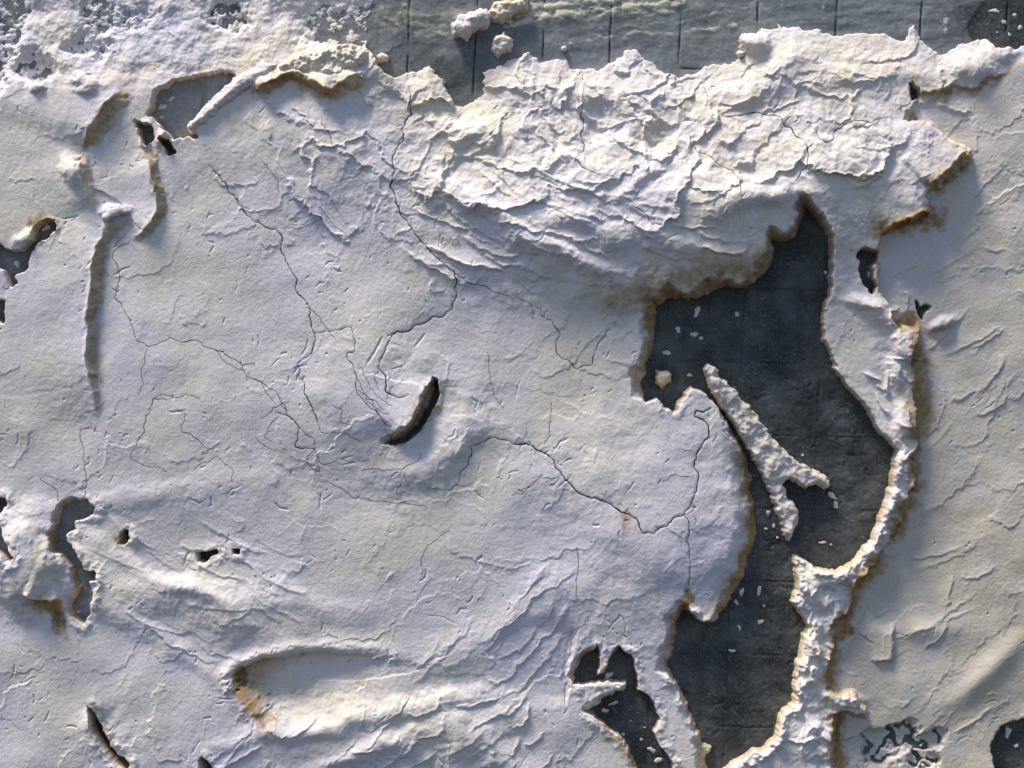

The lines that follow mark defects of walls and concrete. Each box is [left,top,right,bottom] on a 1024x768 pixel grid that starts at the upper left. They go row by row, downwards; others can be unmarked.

flaking render [0,0,52,80]
flaking render [300,0,410,58]
flaking render [967,0,1024,50]
flaking render [128,73,236,245]
crack [689,134,742,198]
flaking render [0,222,57,286]
crack [112,93,710,585]
flaking render [640,208,917,768]
flaking render [55,499,96,620]
flaking render [573,646,671,768]
flaking render [862,720,941,768]
flaking render [990,718,1024,768]